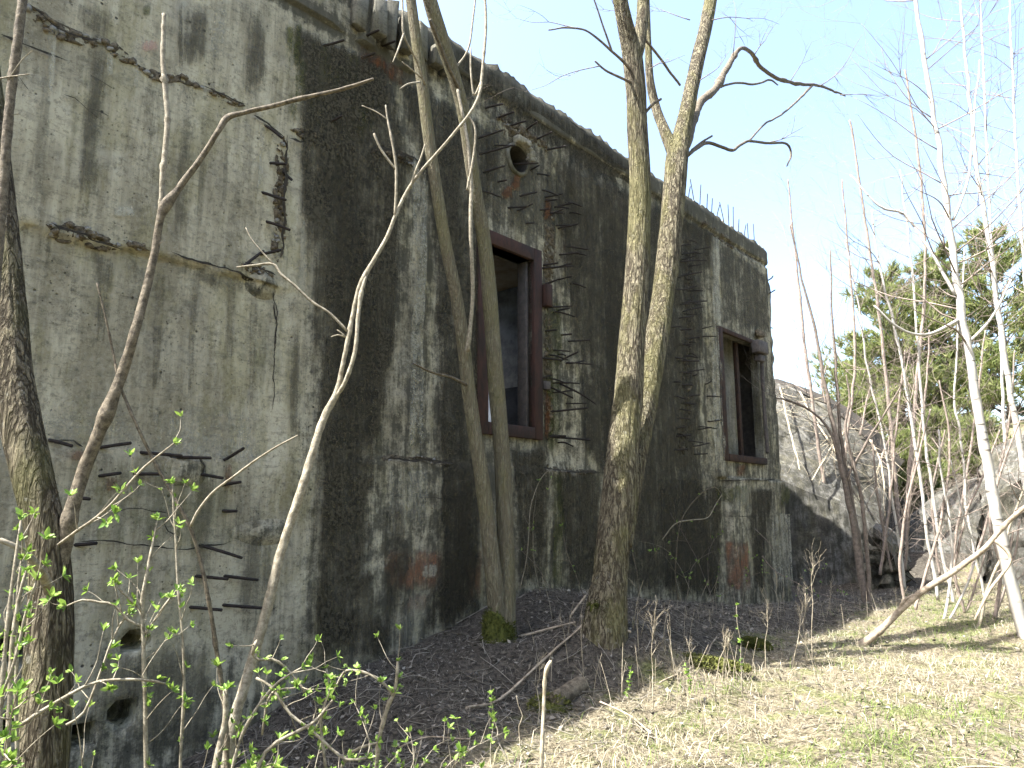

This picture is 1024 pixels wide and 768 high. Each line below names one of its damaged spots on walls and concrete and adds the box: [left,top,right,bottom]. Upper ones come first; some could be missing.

spalling [26,4,245,107]
spalling [46,221,150,252]
spalling [241,124,353,278]
crack [175,253,278,409]
damp [287,25,629,659]
damp [628,193,793,595]